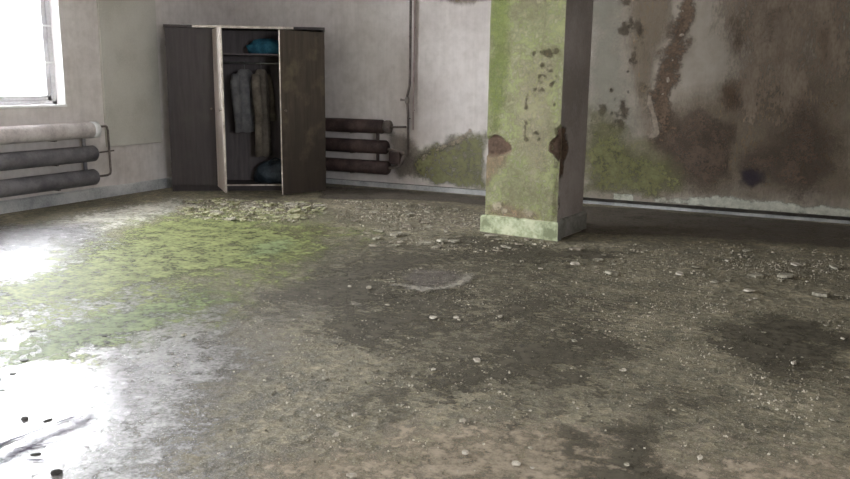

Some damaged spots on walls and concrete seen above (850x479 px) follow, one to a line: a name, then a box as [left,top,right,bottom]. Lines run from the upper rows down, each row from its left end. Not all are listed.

water stain [524,48,559,109]
spalling [486,135,512,184]
spalling [549,127,569,179]
water stain [582,0,850,247]